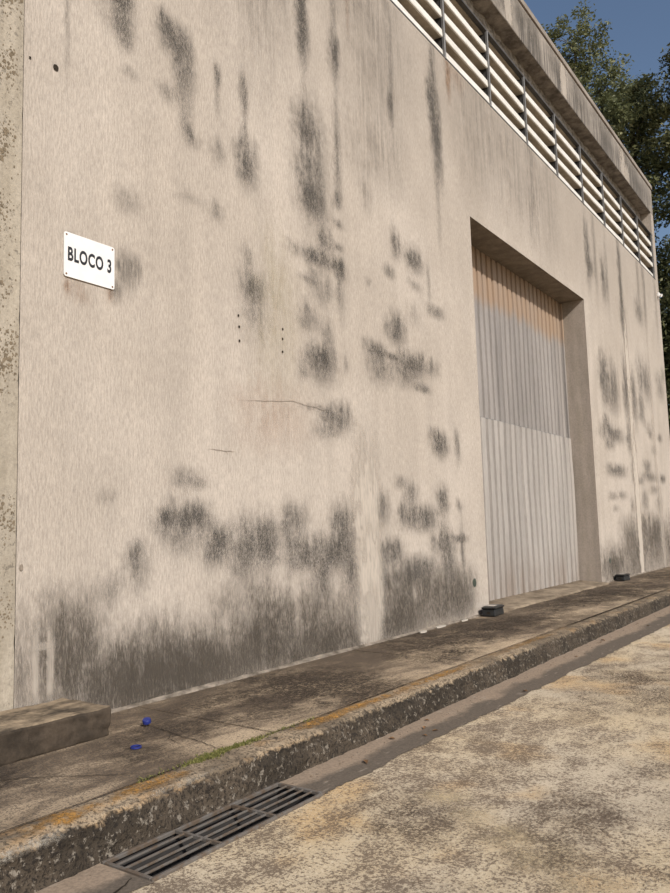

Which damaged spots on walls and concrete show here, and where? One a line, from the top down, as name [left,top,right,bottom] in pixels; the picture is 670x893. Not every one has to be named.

water stain [160,10,191,84]
water stain [298,0,306,48]
water stain [238,139,255,181]
water stain [298,102,323,212]
water stain [427,71,440,169]
water stain [304,231,344,275]
water stain [600,248,670,573]
water stain [32,438,466,706]